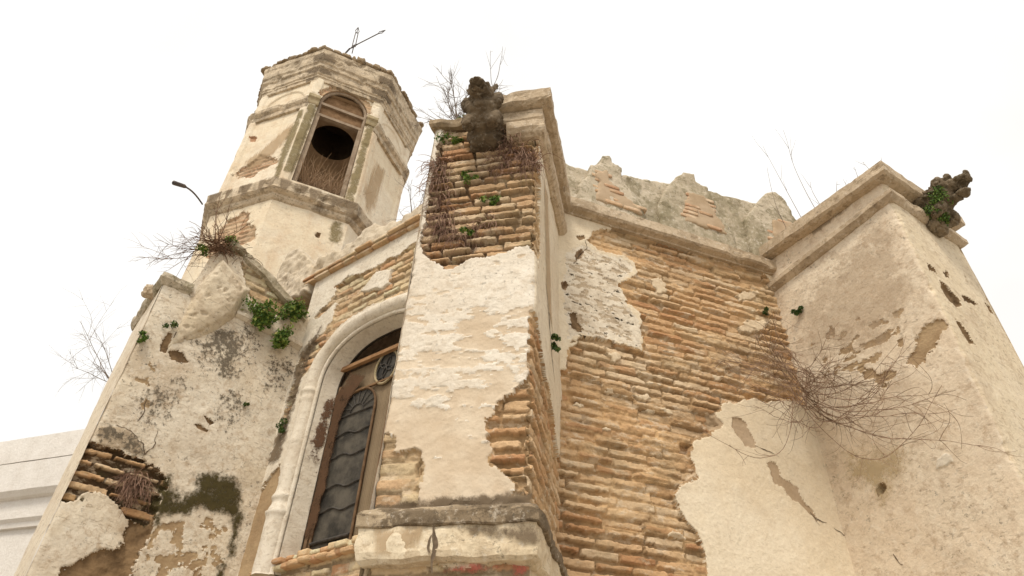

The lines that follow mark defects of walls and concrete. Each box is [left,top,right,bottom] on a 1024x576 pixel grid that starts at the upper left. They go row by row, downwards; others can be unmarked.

flaking render [235,156,279,179]
flaking render [206,210,258,259]
flaking render [160,333,189,364]
flaking render [276,130,805,576]
peeling [810,263,993,388]
flaking render [58,426,228,576]